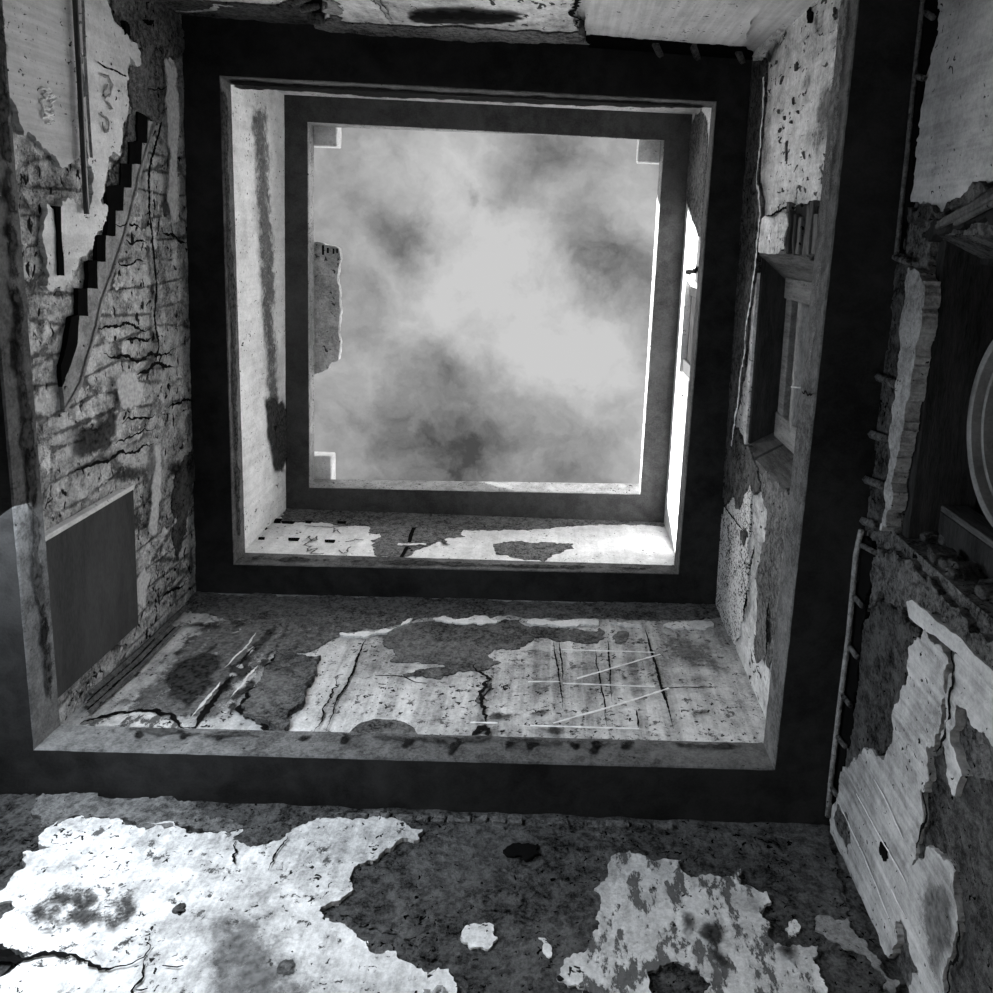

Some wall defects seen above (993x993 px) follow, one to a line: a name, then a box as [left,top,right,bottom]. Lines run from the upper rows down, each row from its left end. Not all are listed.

crack [98,321,174,375]
spalling [185,34,799,731]
crack [74,398,193,472]
peeling [0,384,993,993]
crack [916,650,955,848]
crack [0,936,183,993]
crack [947,924,961,993]